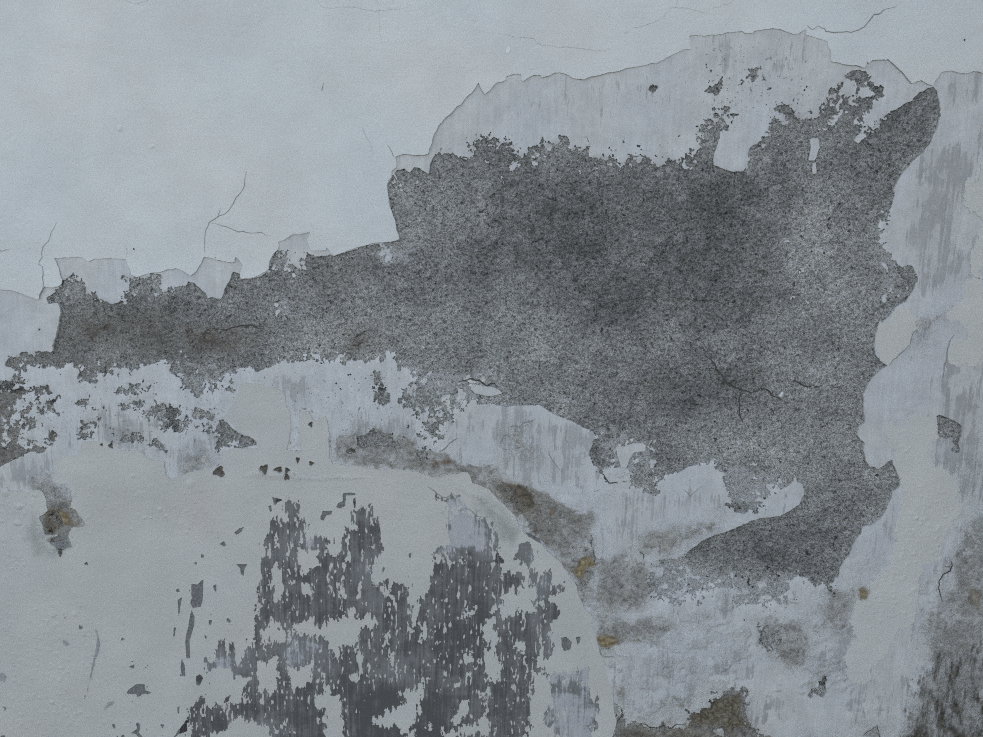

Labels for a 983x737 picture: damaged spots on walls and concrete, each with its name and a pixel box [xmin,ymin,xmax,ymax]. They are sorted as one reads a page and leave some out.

crack [807,6,896,33]
crack [204,175,265,262]
crack [672,355,822,422]
spalling [260,464,290,480]
peeling [320,493,356,520]
peeling [265,563,284,603]
peeling [297,543,341,596]
peeling [173,580,216,686]
peeling [407,603,427,642]
peeling [256,607,395,737]
peeling [372,618,580,737]
spalling [612,686,758,737]